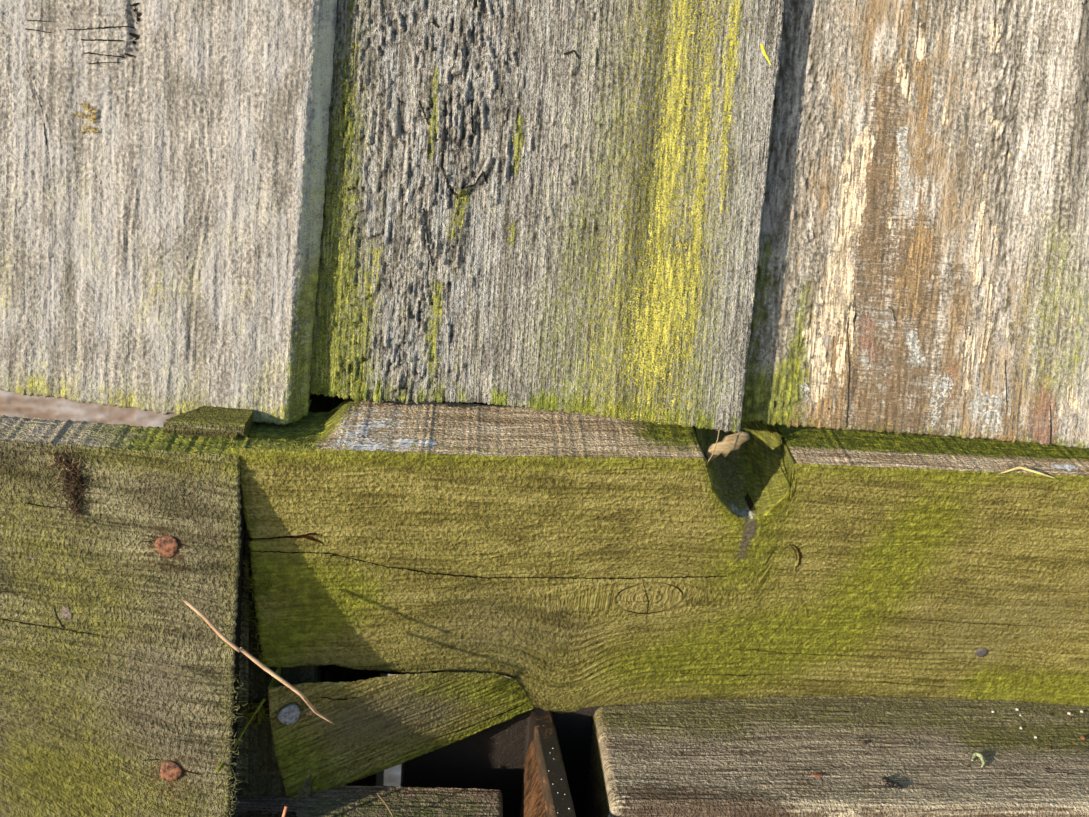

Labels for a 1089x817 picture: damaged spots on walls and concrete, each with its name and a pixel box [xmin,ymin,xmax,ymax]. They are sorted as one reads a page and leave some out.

crack [251,533,727,621]
crack [319,665,465,700]
crack [428,673,527,741]